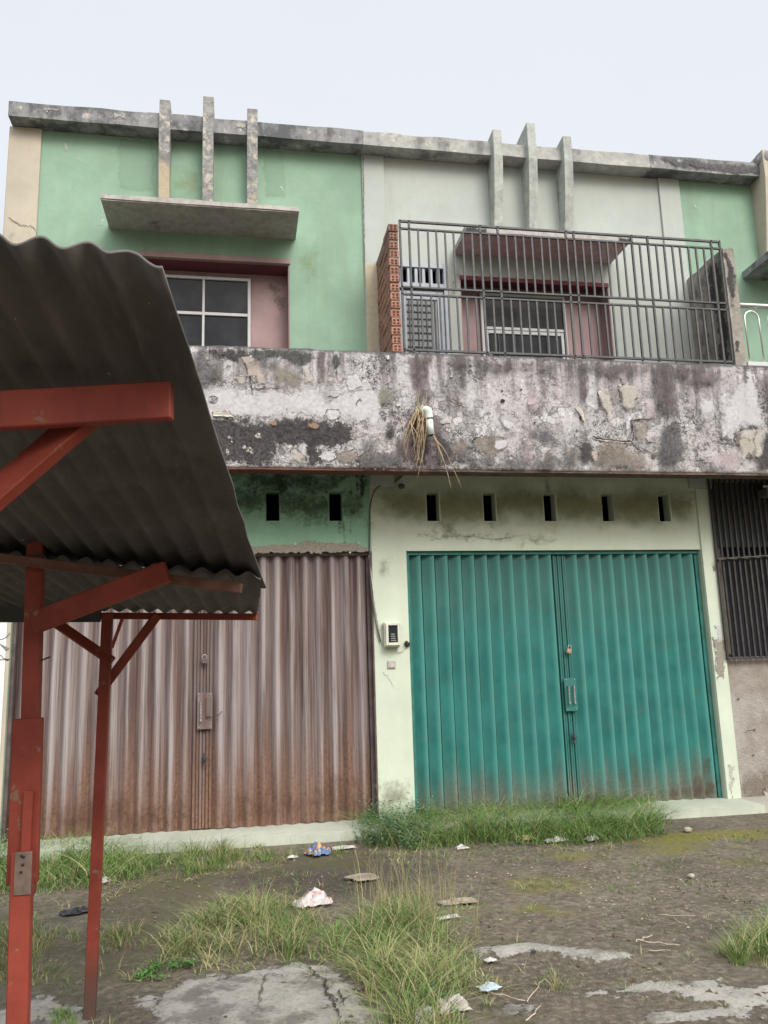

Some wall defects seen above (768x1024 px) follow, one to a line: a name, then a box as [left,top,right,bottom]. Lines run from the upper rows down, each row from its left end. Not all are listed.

peeling [235,355,266,388]
peeling [327,372,363,391]
damp [193,253,768,496]
spalling [212,410,234,419]
peeling [324,409,341,422]
spalling [597,363,655,443]
peeling [735,427,764,462]
peeling [712,624,725,679]
crack [258,962,350,1020]